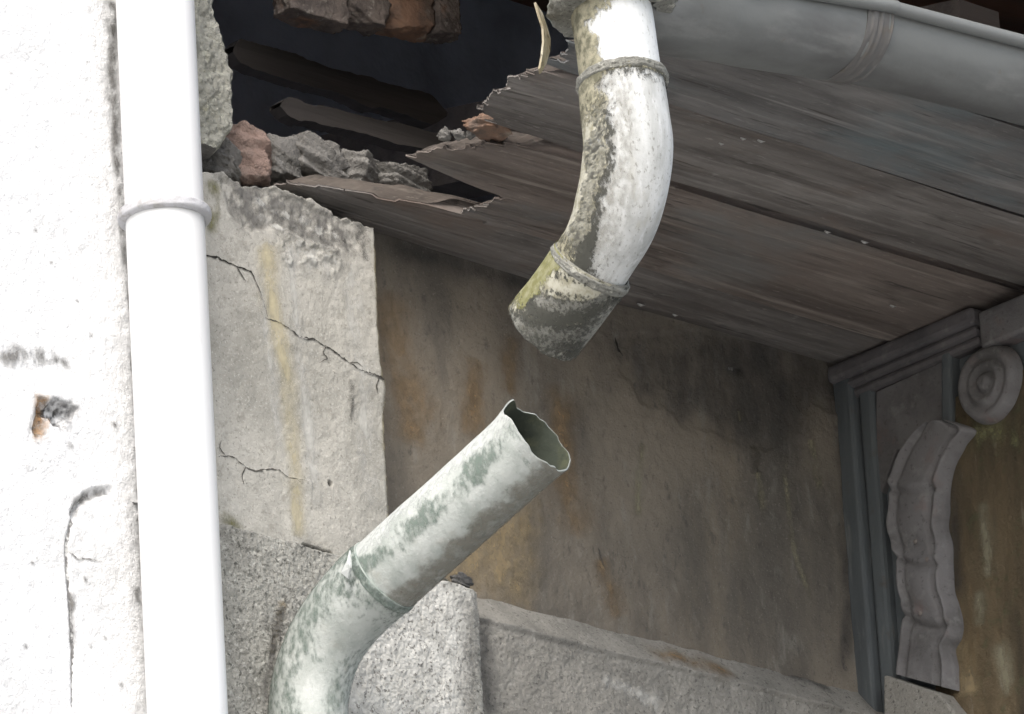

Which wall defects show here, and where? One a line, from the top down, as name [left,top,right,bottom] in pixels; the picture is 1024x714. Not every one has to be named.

peeling [230,182,358,251]
spalling [32,399,70,437]
crack [219,443,312,483]
leakage [262,246,317,482]
crack [206,255,385,393]
crack [65,502,102,707]